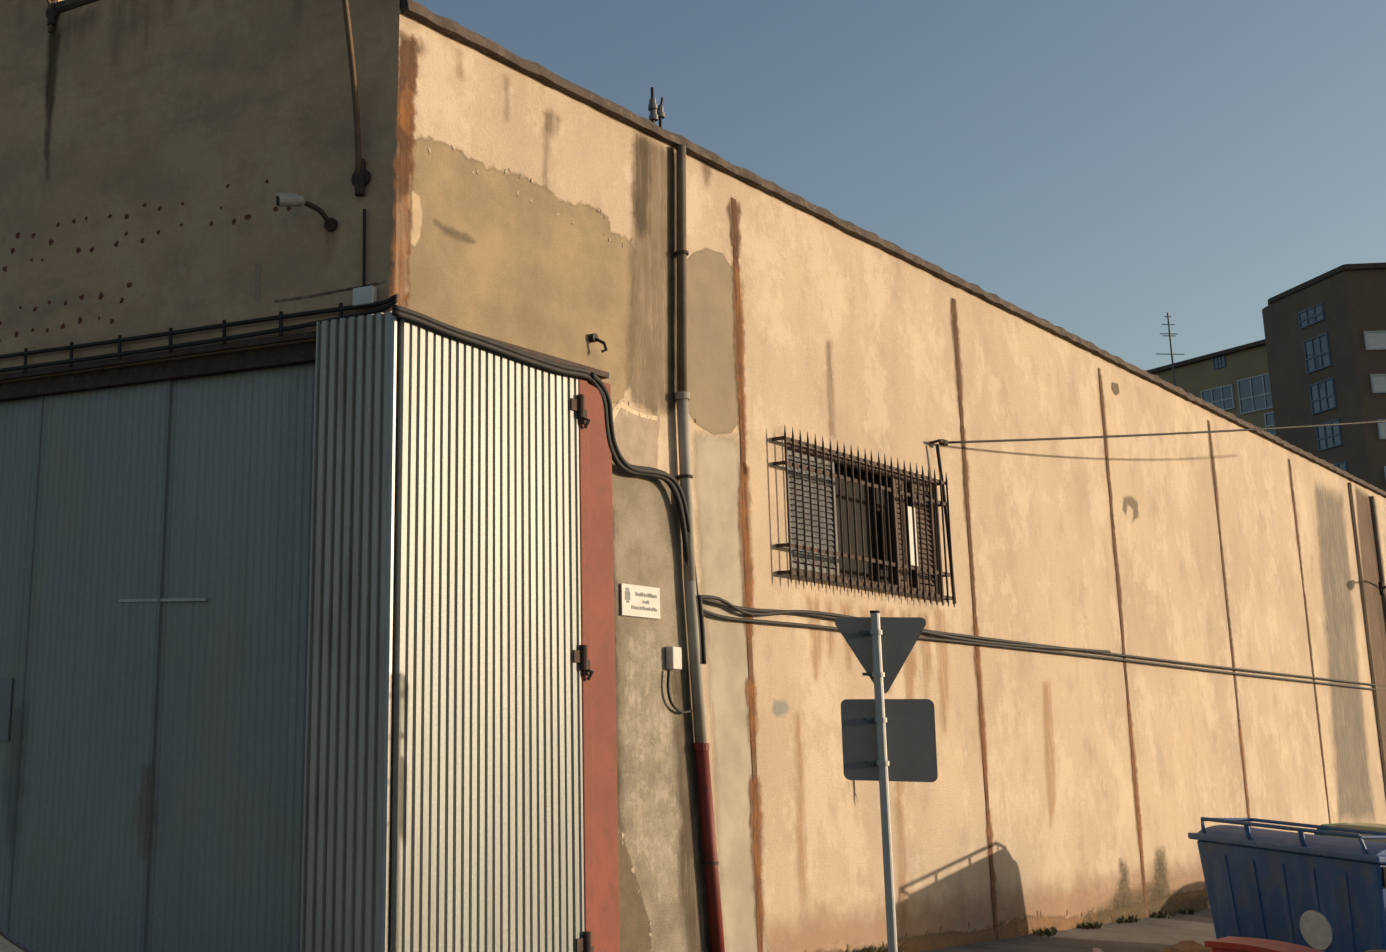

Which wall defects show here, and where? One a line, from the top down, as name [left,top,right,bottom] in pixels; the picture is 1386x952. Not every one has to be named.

damp [46,18,59,150]
corrosion [393,37,417,308]
damp [630,136,677,414]
peeling [406,137,767,952]
corrosion [728,202,754,638]
corrosion [746,678,757,752]
corrosion [952,299,998,940]
damp [1316,489,1386,819]
corrosion [750,777,765,949]
flaking render [882,888,1208,952]